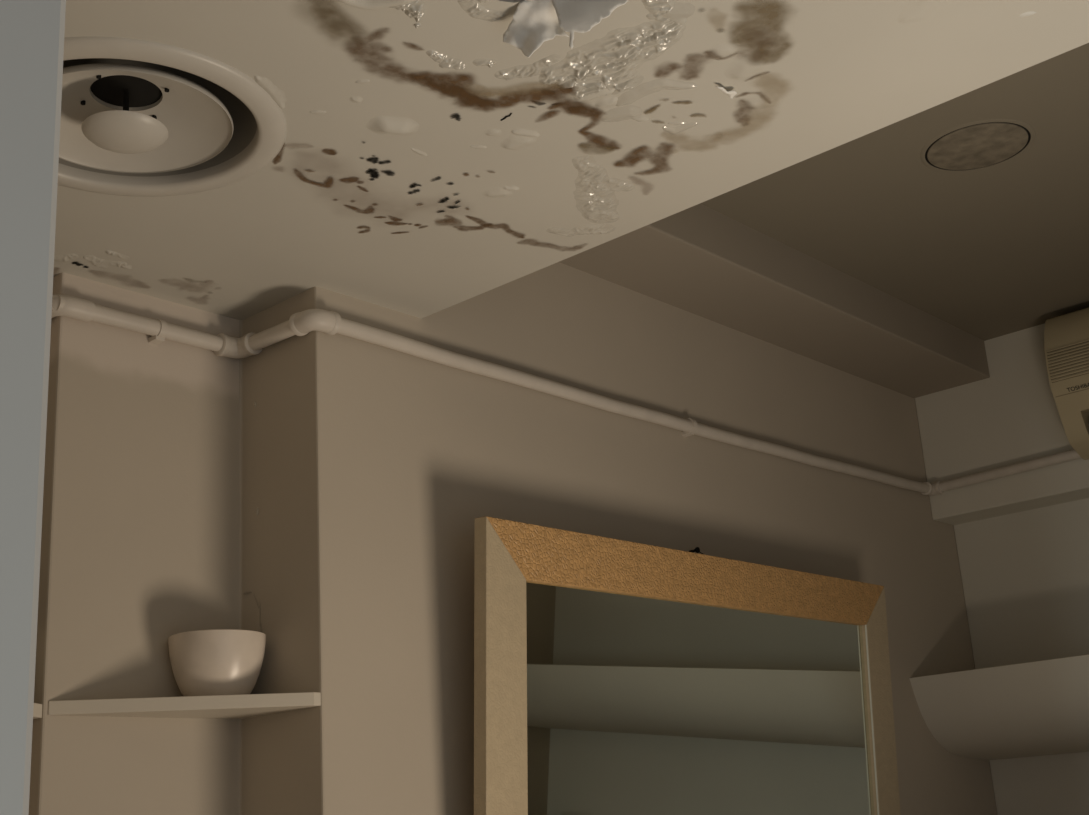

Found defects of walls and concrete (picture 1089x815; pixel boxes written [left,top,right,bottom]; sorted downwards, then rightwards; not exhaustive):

peeling [503,0,628,58]
leakage [720,3,789,62]
leakage [350,32,672,175]
leakage [295,156,394,192]
leakage [335,177,524,238]